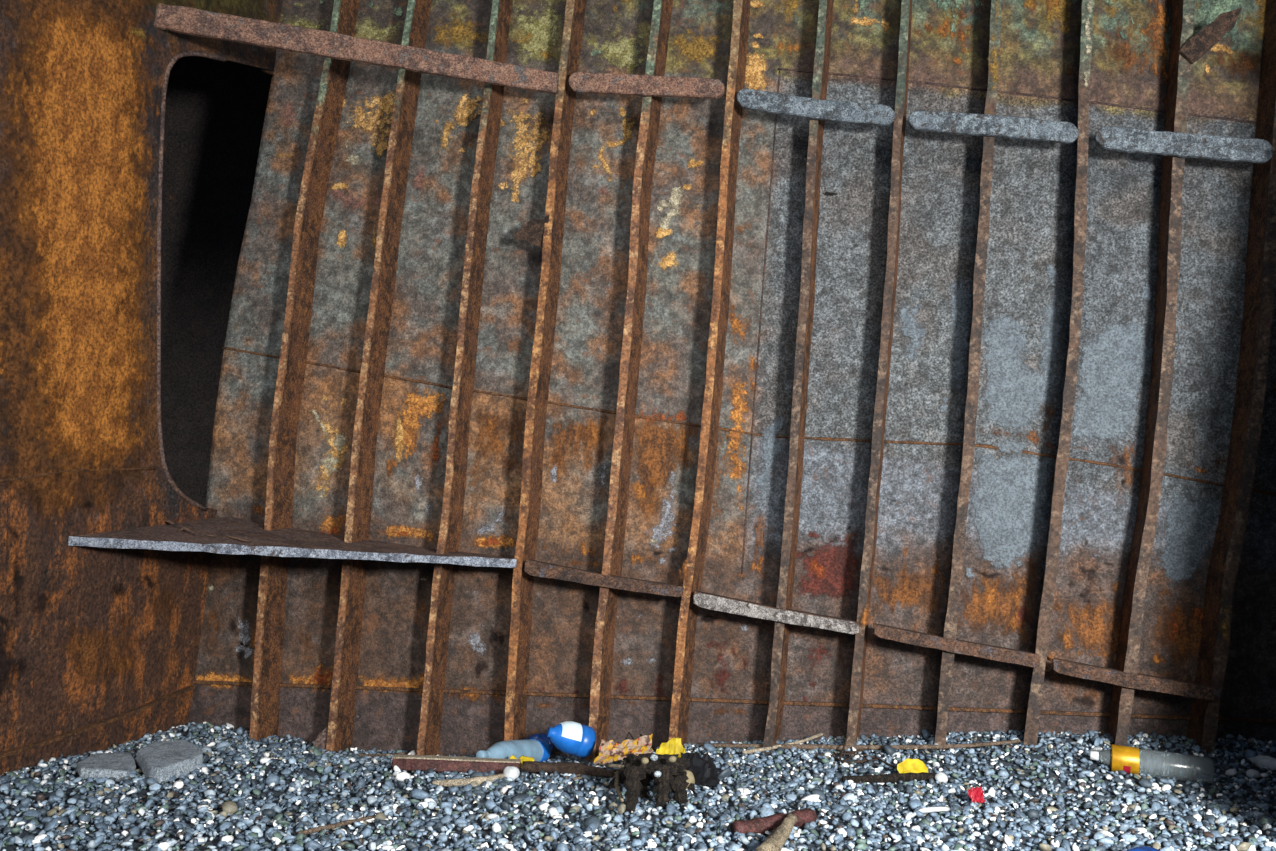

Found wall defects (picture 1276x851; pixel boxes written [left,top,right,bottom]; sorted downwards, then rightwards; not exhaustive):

corrosion [342,91,395,165]
corrosion [436,94,483,153]
corrosion [498,98,550,202]
corrosion [0,0,159,524]
corrosion [312,395,350,498]
corrosion [386,389,446,476]
corrosion [550,420,606,488]
corrosion [632,411,697,518]
leakage [0,556,48,691]
corrosion [475,507,520,564]
corrosion [797,526,858,598]
corrosion [960,562,1036,639]